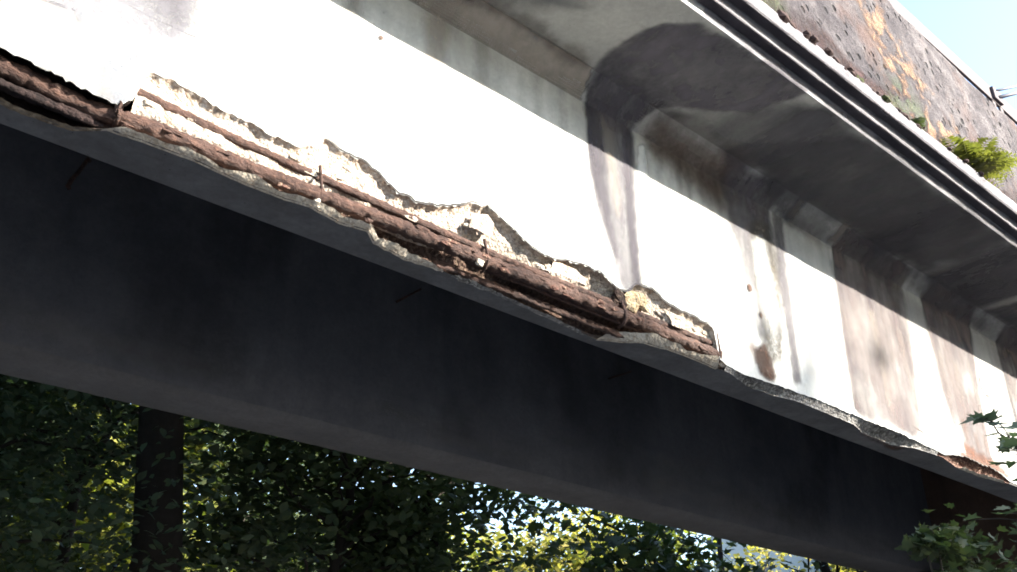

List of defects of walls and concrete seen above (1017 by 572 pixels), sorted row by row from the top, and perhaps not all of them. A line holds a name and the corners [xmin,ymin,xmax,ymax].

damp [0,0,199,104]
spalling [0,47,726,370]
damp [411,0,1017,460]
rust [756,344,776,380]
spalling [937,452,1009,483]